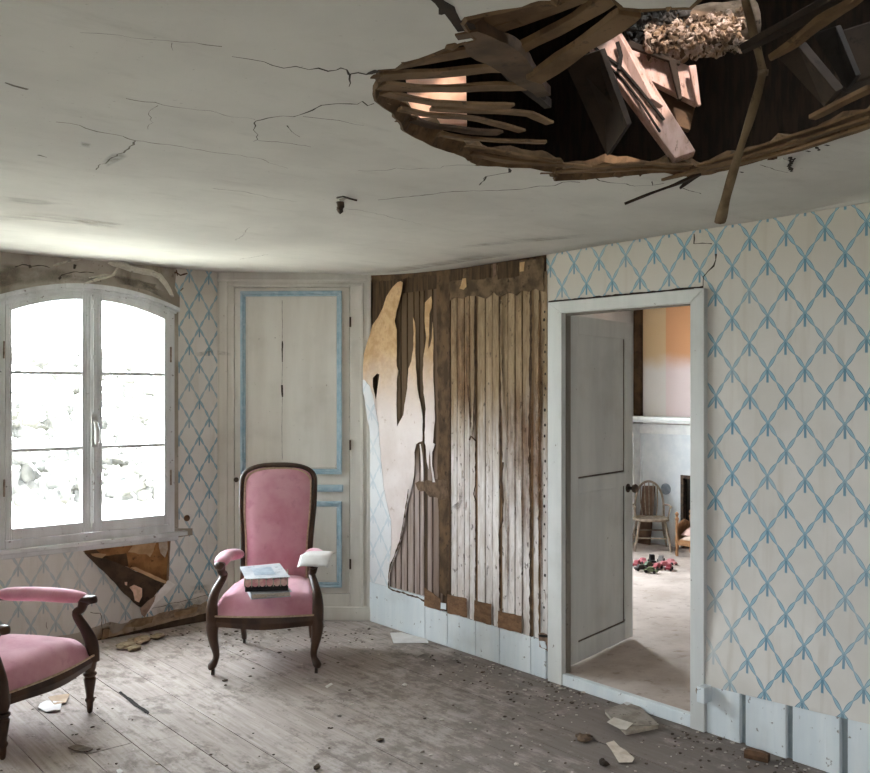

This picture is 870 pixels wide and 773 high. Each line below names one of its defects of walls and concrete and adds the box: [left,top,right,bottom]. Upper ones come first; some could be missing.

crack [59,33,381,170]
spalling [372,0,870,181]
peeling [85,261,174,297]
crack [548,234,717,302]